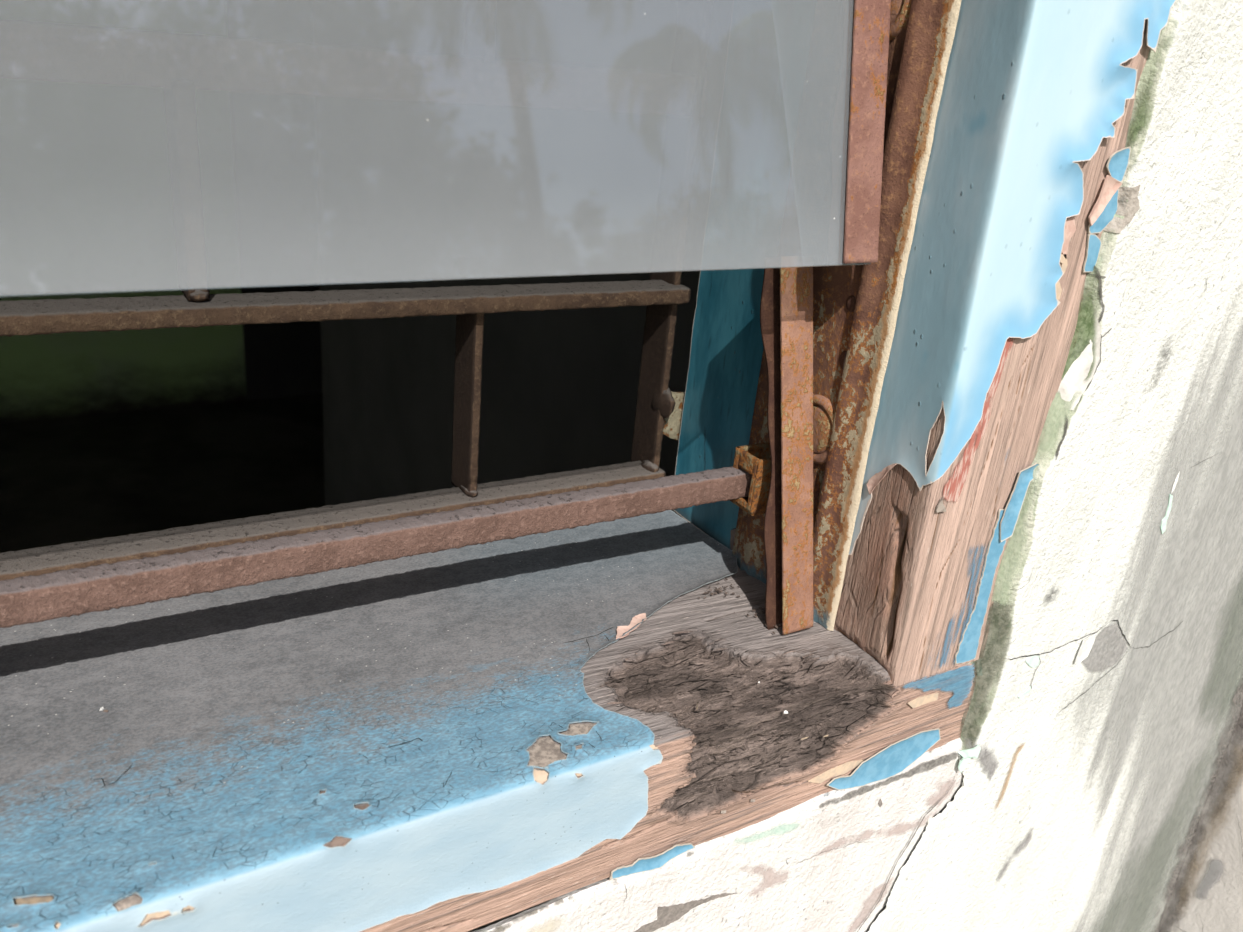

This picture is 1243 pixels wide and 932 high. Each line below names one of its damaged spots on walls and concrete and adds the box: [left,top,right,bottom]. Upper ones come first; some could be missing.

flaking render [1056,147,1140,300]
peeling [935,338,1013,513]
peeling [904,463,1040,708]
peeling [616,613,647,639]
crack [1010,620,1184,714]
flaking render [1074,624,1127,671]
leakage [1076,334,1243,932]
peeling [527,723,596,784]
peeling [808,728,941,790]
flaking render [929,744,981,805]
peeling [609,843,695,880]
flaking render [635,893,737,932]